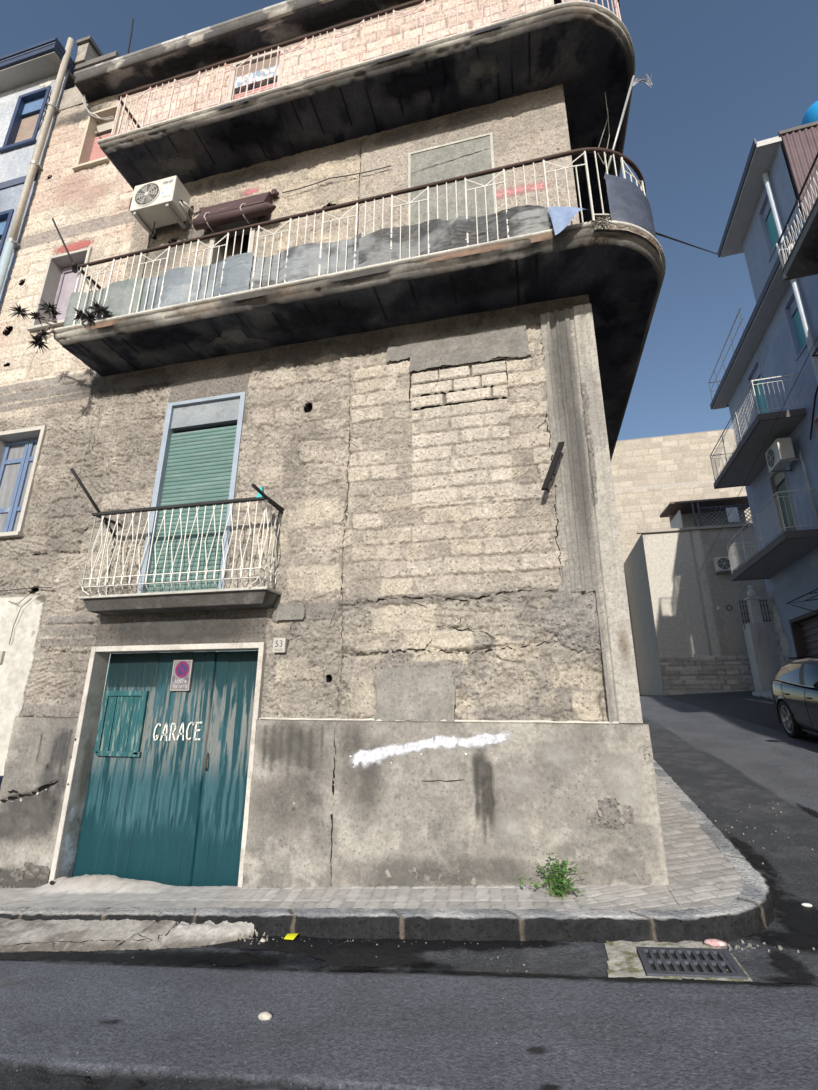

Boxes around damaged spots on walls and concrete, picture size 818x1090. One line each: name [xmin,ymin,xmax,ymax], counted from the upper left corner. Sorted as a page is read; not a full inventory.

damp [215,96,256,110]
damp [357,109,488,146]
damp [189,165,288,192]
damp [122,304,402,369]
damp [82,369,186,395]
crack [330,358,562,867]
crack [1,781,59,803]
damp [474,755,524,841]